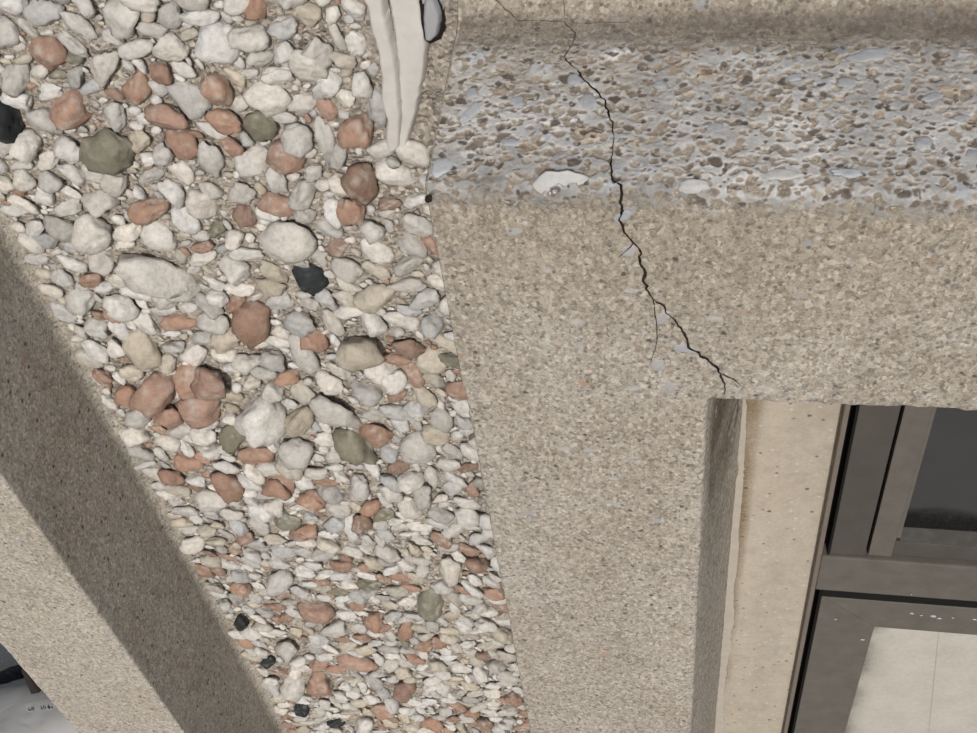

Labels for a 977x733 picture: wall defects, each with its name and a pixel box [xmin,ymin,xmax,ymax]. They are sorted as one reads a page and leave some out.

crack [496,0,740,394]